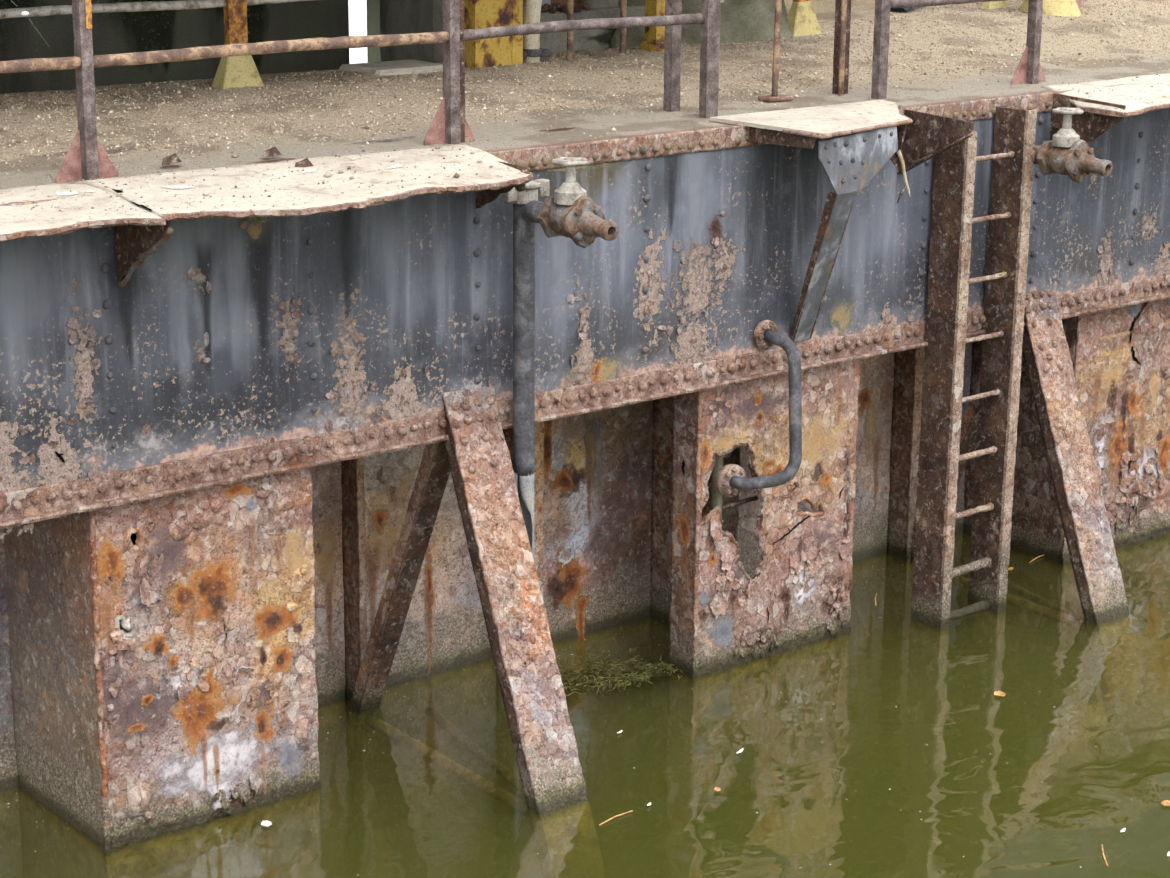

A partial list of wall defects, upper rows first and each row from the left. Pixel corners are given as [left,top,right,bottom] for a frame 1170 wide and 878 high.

peeling [0,278,104,499]
peeling [268,285,304,389]
peeling [310,278,429,435]
peeling [565,281,599,388]
peeling [632,211,746,368]
rust [1055,333,1170,587]
rust [148,526,235,639]
rust [245,587,305,691]
rust [425,547,437,665]
rust [548,547,588,643]
spalling [709,513,760,619]
rust [112,635,303,810]